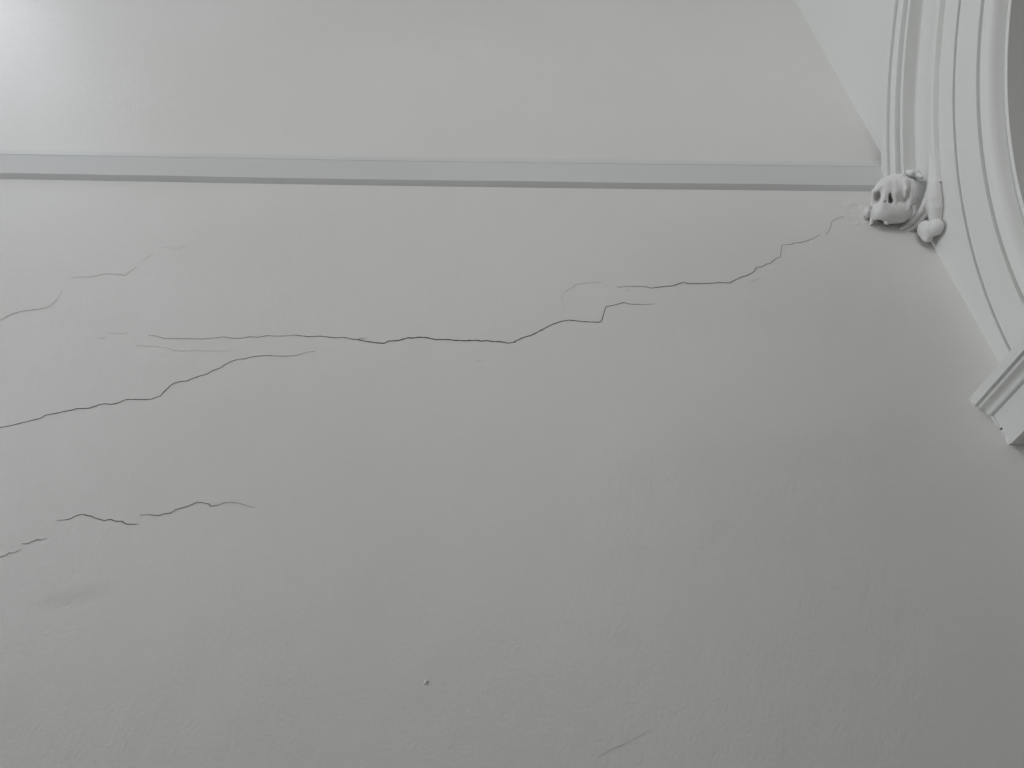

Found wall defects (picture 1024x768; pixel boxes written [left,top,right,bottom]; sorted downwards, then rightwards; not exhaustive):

crack [0,217,841,428]
crack [1,502,250,557]